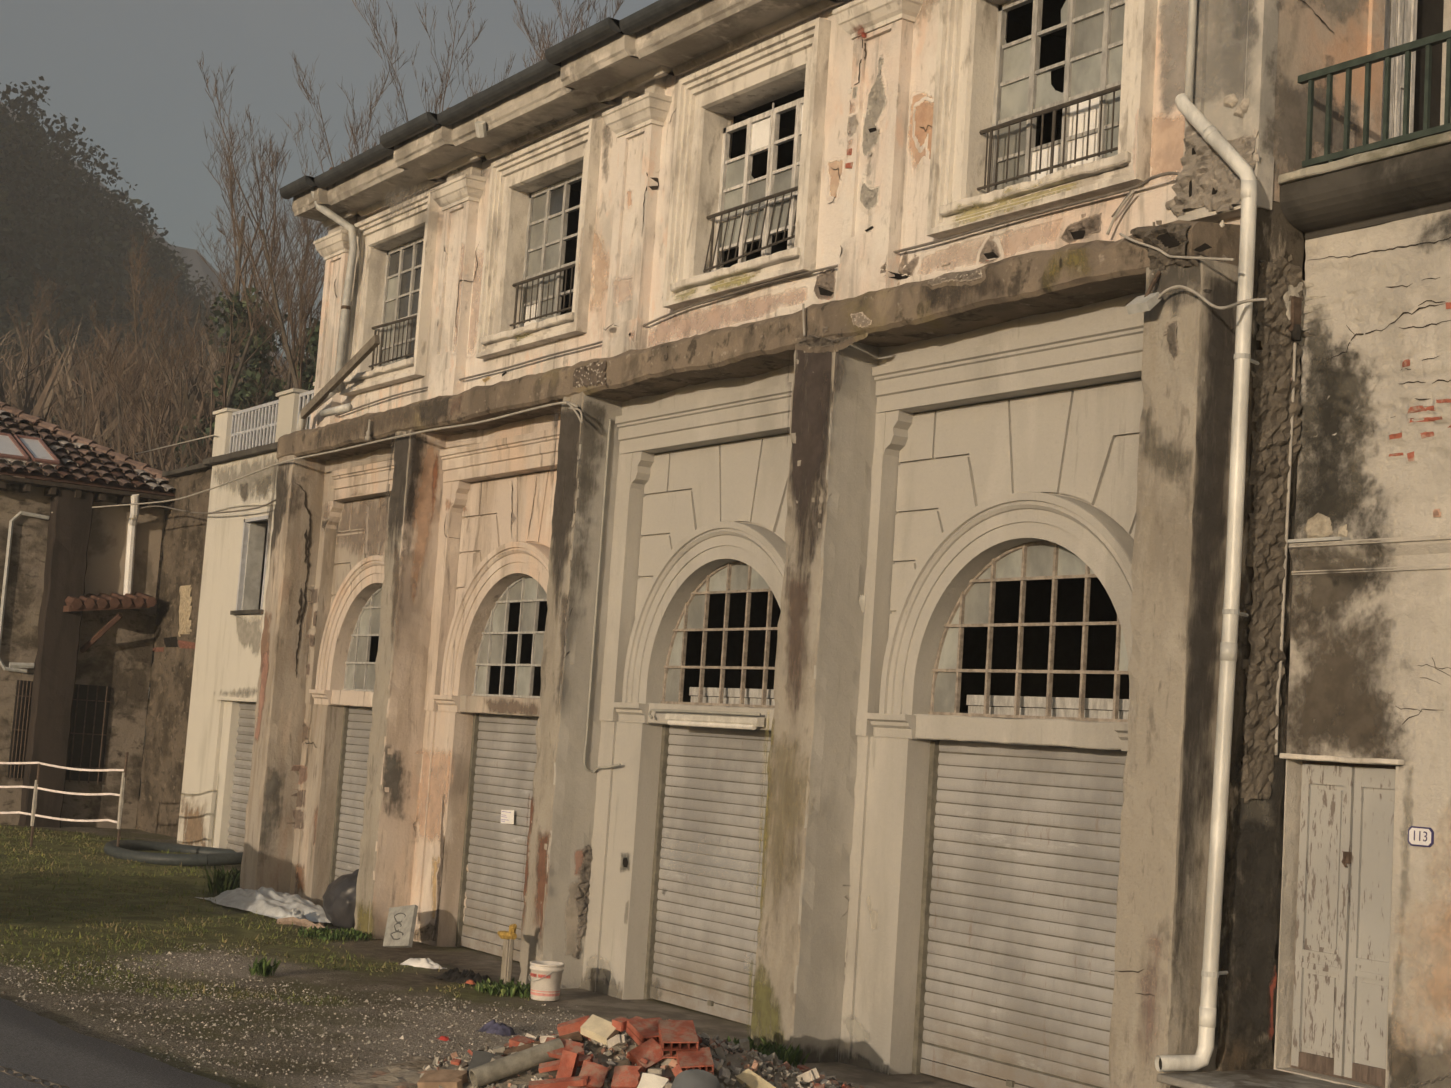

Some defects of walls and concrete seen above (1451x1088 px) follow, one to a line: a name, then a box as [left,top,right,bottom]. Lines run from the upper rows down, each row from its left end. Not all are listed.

peeling [578,227,877,360]
spalling [825,48,934,232]
peeling [875,205,1108,290]
spalling [1130,93,1259,270]
water stain [1264,62,1359,177]
crack [1307,237,1451,418]
crack [295,484,312,678]
water stain [318,396,456,641]
water stain [550,402,605,698]
water stain [1215,315,1398,1044]
water stain [383,748,418,837]
spalling [565,845,593,959]